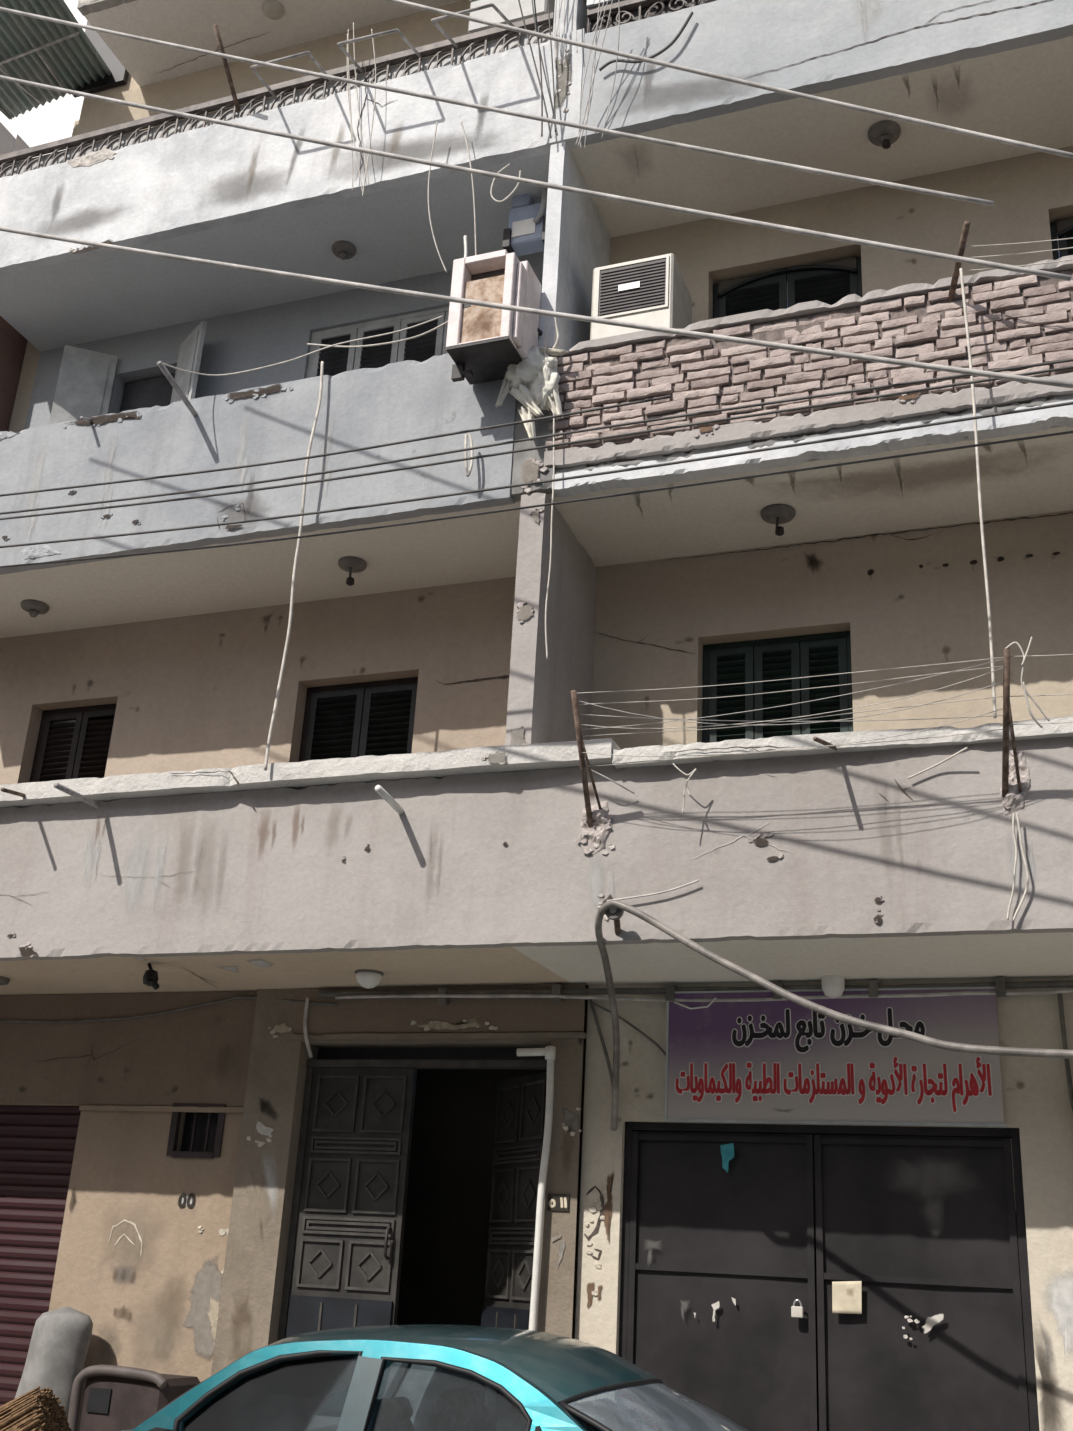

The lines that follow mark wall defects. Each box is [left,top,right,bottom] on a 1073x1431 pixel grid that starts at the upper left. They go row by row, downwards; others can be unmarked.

crack [744,0,1049,79]
damp [377,143,456,166]
spalling [0,431,20,442]
peeling [21,541,62,560]
crack [595,632,696,654]
crack [436,675,510,684]
spalling [247,1121,274,1147]